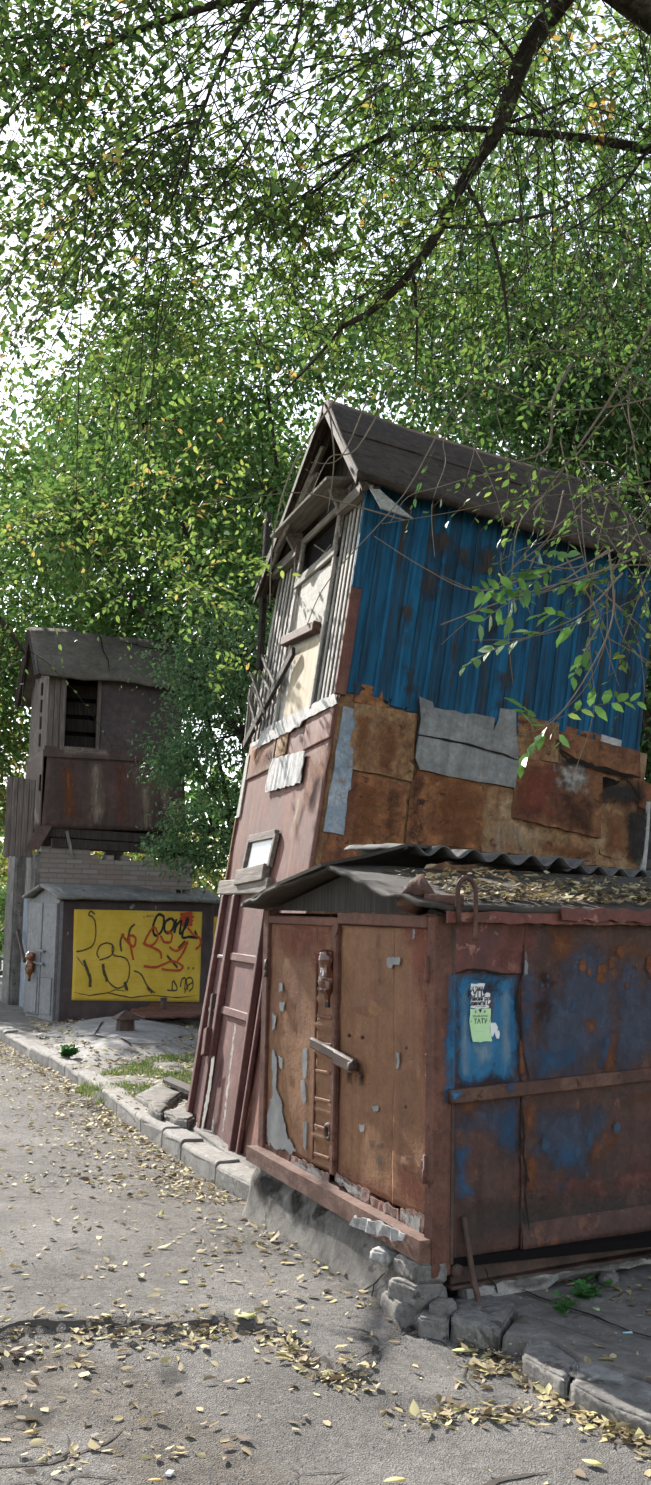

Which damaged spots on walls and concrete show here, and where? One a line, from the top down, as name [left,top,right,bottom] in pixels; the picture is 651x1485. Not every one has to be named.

corrosion [291,751,328,832]
peeling [445,926,651,1099]
peeling [267,983,363,1197]
corrosion [461,1074,513,1111]
peeling [532,1107,621,1176]
spalling [254,1174,325,1227]
crack [0,1408,124,1485]
crack [442,1471,551,1485]